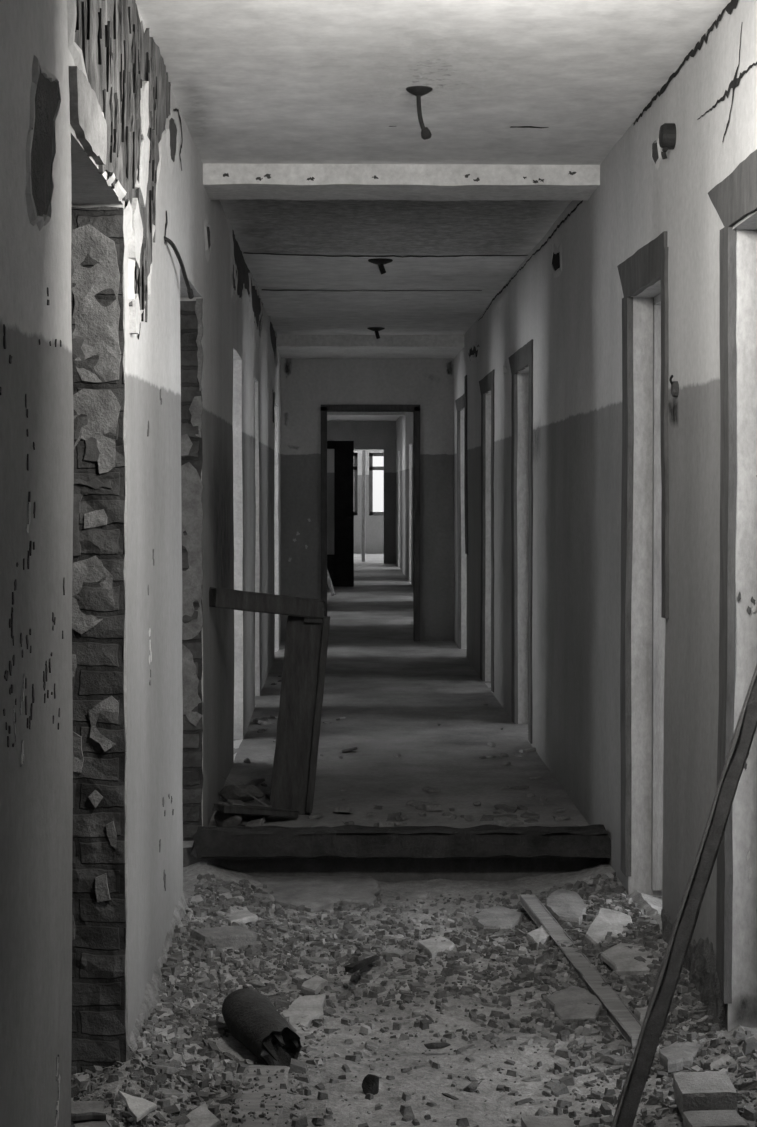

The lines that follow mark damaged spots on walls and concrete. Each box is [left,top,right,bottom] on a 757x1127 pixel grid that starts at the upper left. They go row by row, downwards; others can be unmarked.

crack [633,0,757,142]
flaking render [3,0,189,1127]
flaking render [162,298,204,841]